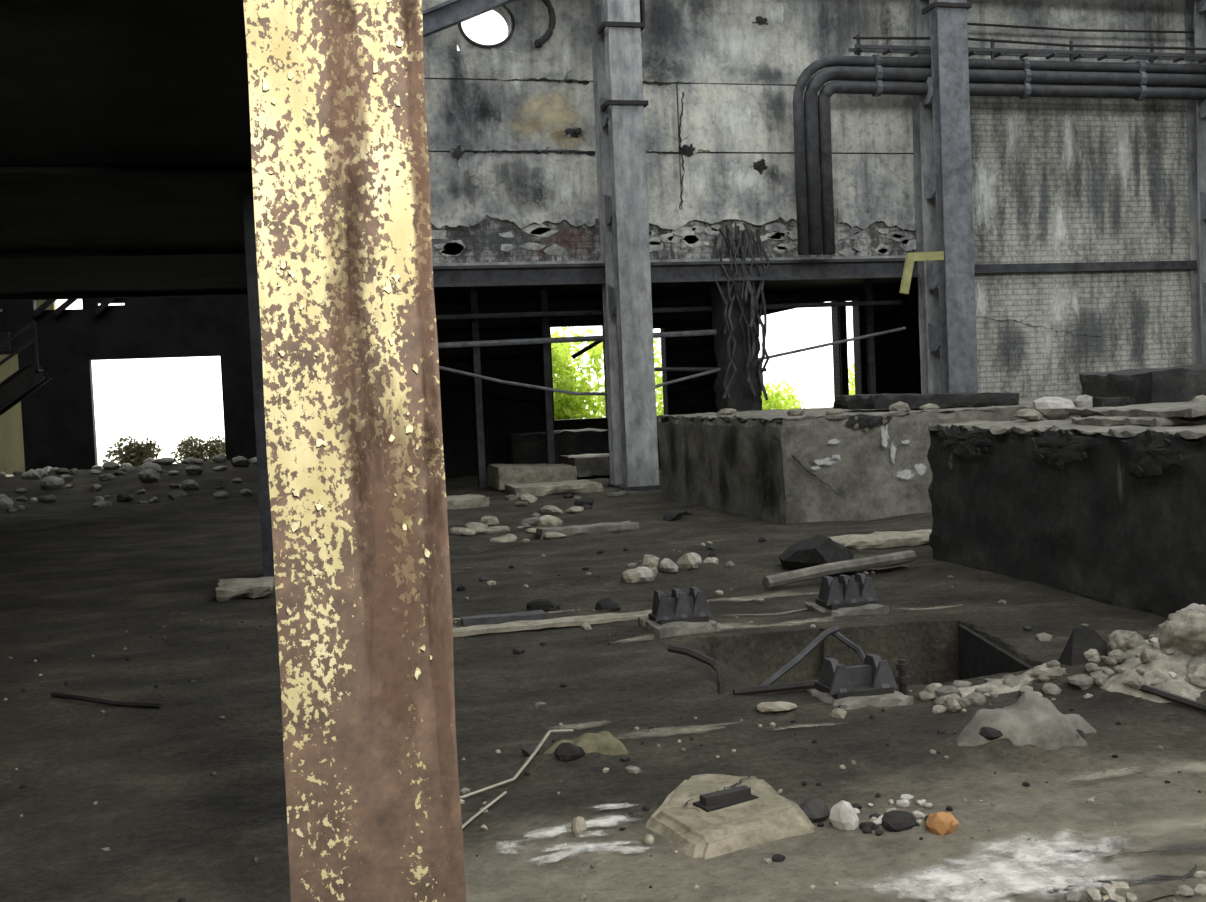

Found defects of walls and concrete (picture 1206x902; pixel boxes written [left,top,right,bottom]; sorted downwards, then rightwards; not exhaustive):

leakage [450,45,465,90]
leakage [479,37,581,148]
leakage [696,3,786,81]
flaking render [431,213,595,257]
flaking render [648,209,797,253]
leakage [729,168,767,192]
leakage [976,115,1024,235]
leakage [1040,168,1066,254]
leakage [1063,115,1175,251]
leakage [975,283,986,316]
leakage [1131,298,1145,357]
corrosion [329,0,452,766]